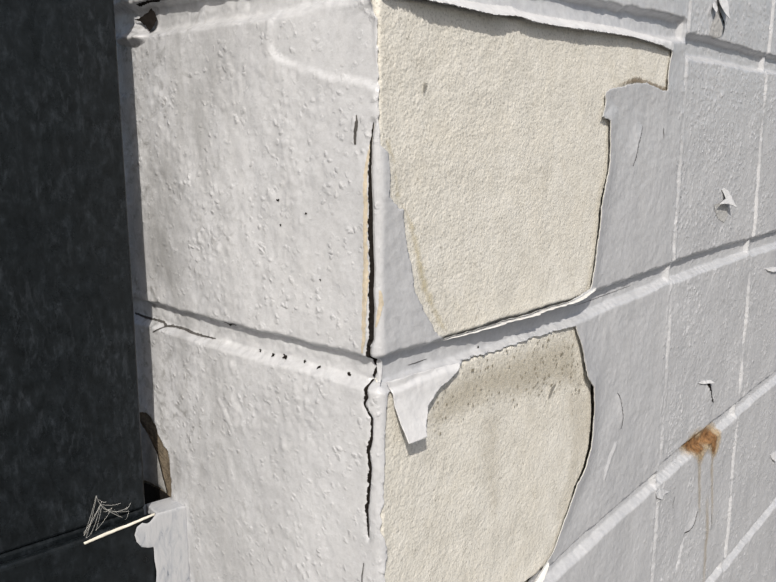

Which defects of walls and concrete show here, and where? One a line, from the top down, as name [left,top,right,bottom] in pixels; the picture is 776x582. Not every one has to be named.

crack [136,0,161,8]
peeling [710,0,730,39]
peeling [371,0,674,341]
peeling [714,188,737,222]
crack [353,115,384,537]
spalling [140,412,172,504]
peeling [380,327,591,582]
corrosion [682,425,721,459]